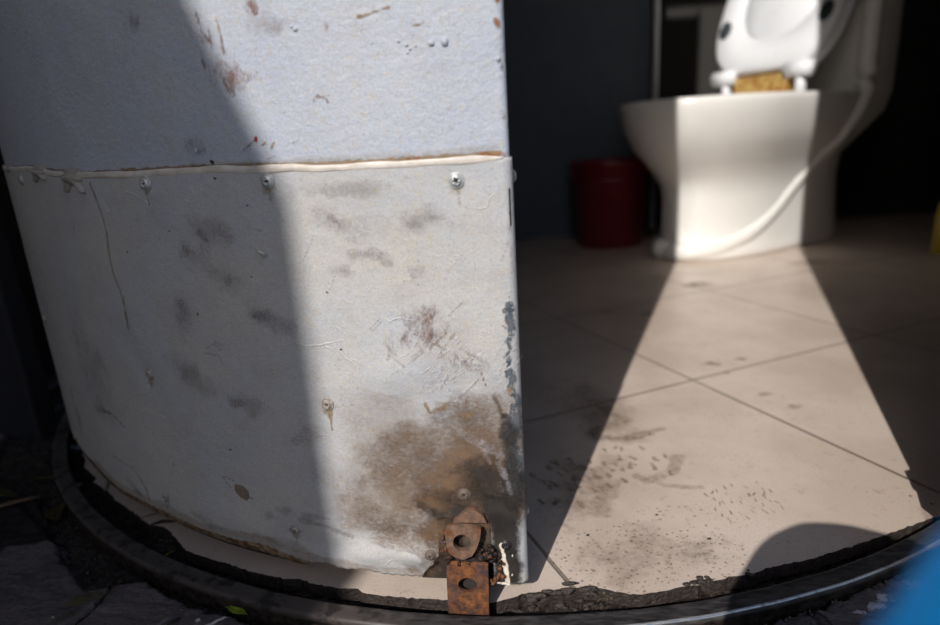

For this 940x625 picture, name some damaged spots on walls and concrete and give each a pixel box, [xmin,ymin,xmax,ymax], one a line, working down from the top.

damp [493,397,524,510]